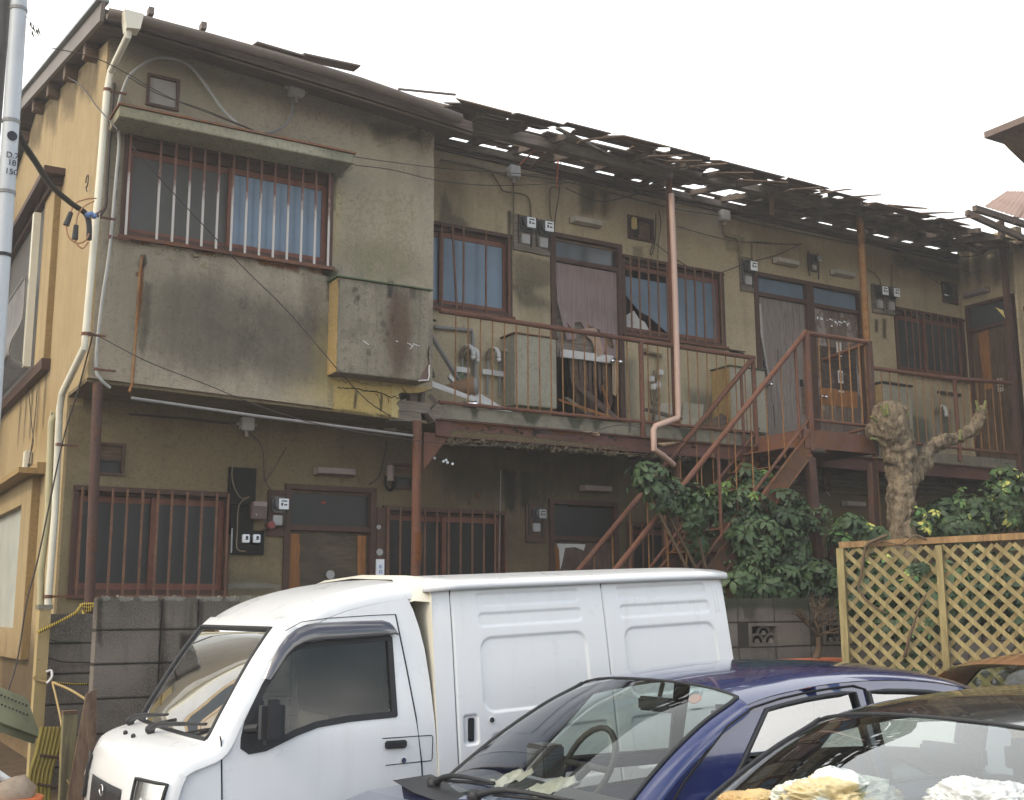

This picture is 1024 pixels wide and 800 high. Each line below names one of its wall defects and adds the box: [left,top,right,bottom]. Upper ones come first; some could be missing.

corrosion [258,260,326,274]
corrosion [131,240,148,320]
corrosion [452,422,594,440]
spalling [446,437,691,461]